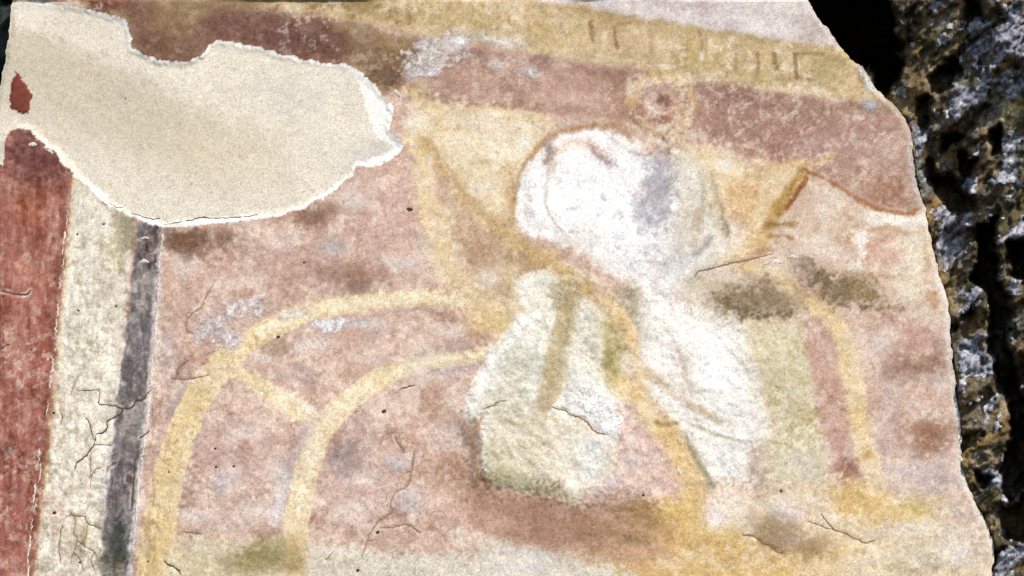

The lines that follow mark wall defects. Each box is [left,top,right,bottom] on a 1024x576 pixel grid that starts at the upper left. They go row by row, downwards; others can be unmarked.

flaking render [0,0,403,415]
crack [185,283,214,334]
peeling [26,448,42,576]
crack [58,513,99,570]
crack [60,360,210,510]
peeling [132,399,150,552]
crack [362,437,421,555]
crack [552,406,606,435]
crack [808,514,874,543]